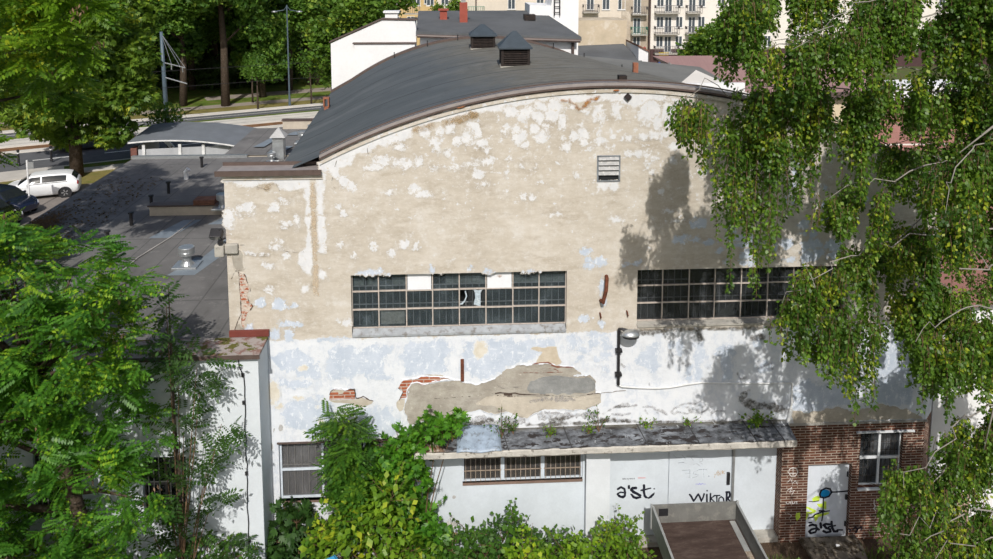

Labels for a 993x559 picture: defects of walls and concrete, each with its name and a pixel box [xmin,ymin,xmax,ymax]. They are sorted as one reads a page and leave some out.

peeling [785,155,803,205]
peeling [660,183,844,268]
flaking render [220,92,681,451]
peeling [633,337,737,383]